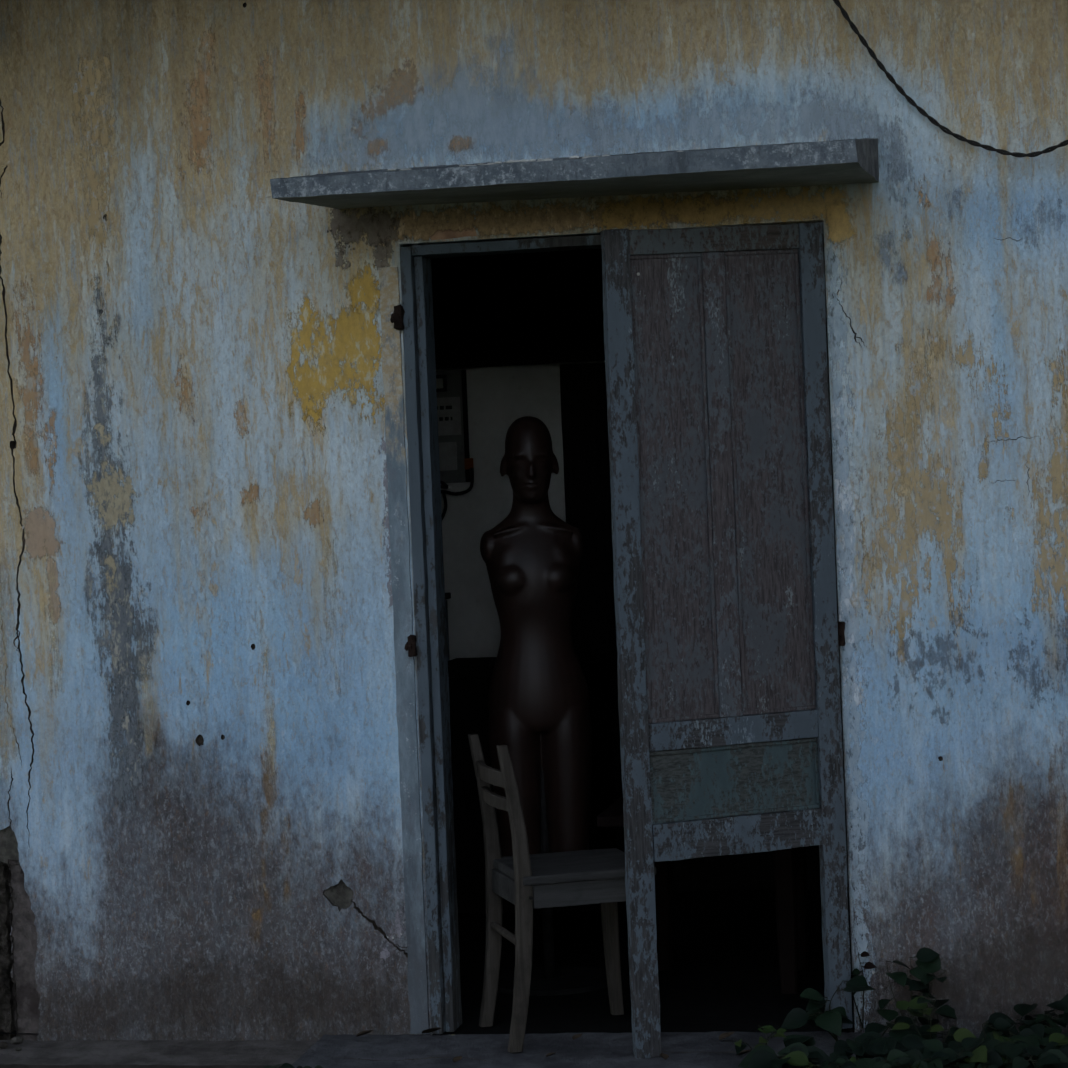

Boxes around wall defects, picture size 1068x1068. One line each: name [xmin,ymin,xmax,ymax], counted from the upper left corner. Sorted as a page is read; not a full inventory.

crack [0,99,8,198]
peeling [284,207,407,434]
crack [828,276,867,347]
crack [0,234,34,843]
spalling [323,879,354,912]